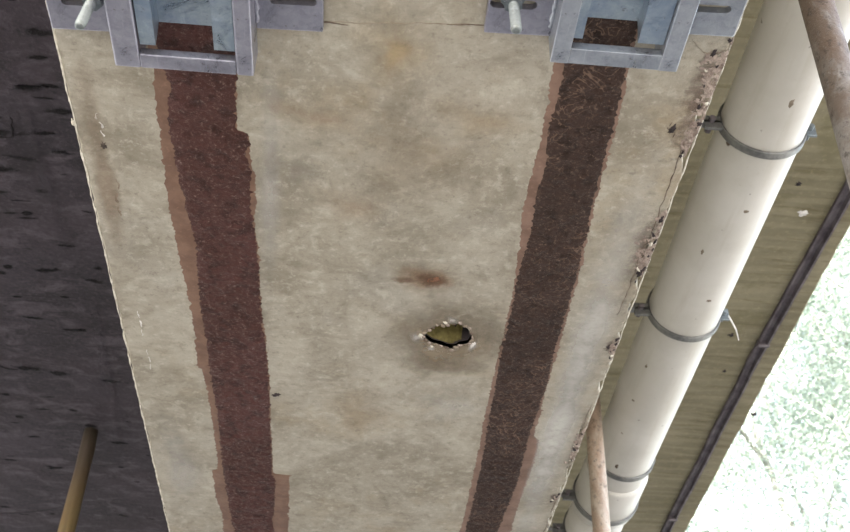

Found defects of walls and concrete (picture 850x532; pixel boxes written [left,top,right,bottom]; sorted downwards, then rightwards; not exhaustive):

crack [324,19,484,27]
spalling [667,30,737,163]
spalling [633,210,667,283]
corrosion [398,272,445,285]
spalling [414,319,476,352]
spalling [603,337,620,359]
spalling [564,423,588,470]